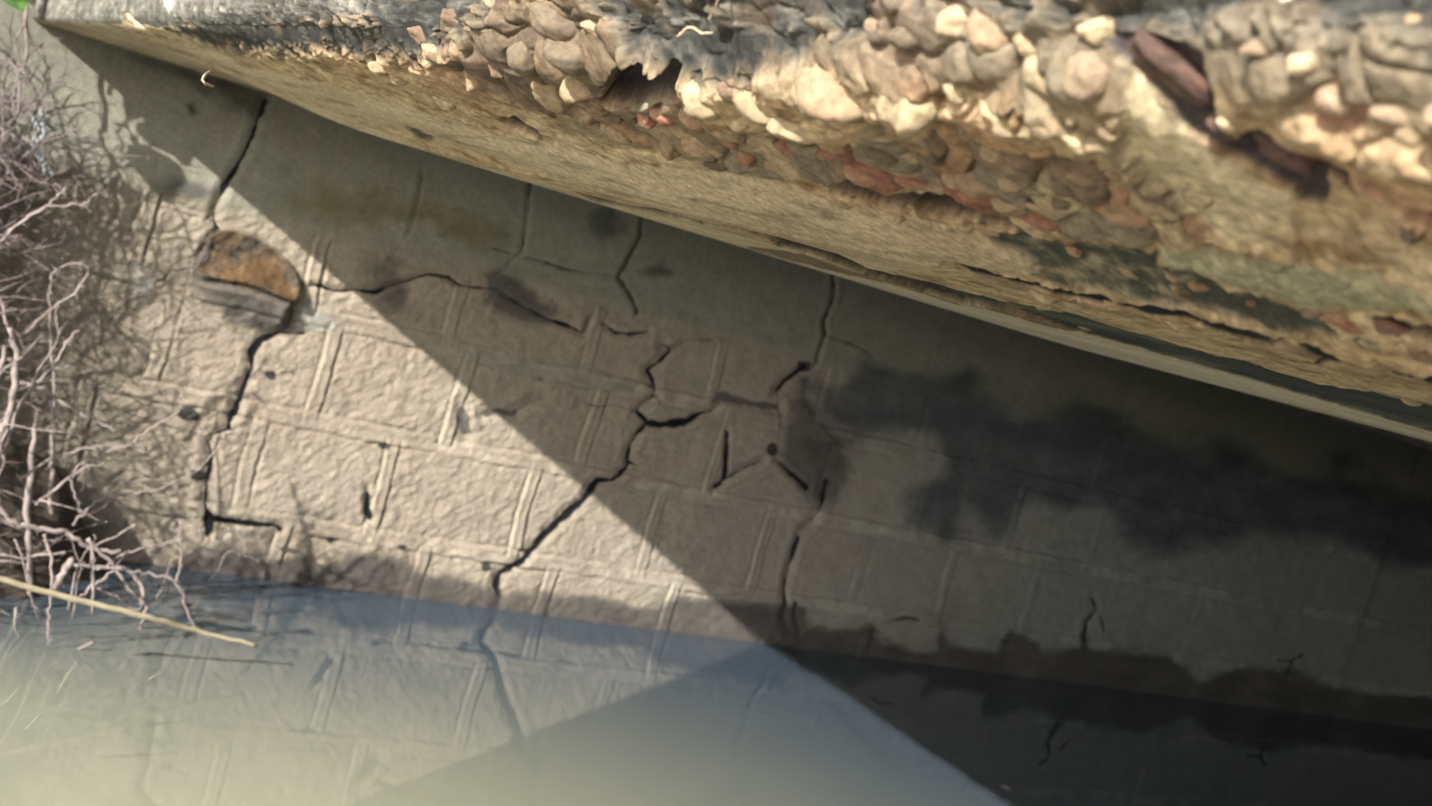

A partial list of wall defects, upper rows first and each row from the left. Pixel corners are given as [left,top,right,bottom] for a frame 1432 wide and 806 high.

crack [212,99,268,233]
spalling [122,0,1432,407]
crack [100,268,186,345]
spalling [177,407,199,421]
crack [203,183,873,608]
spalling [766,442,778,456]
water stain [803,367,1432,563]